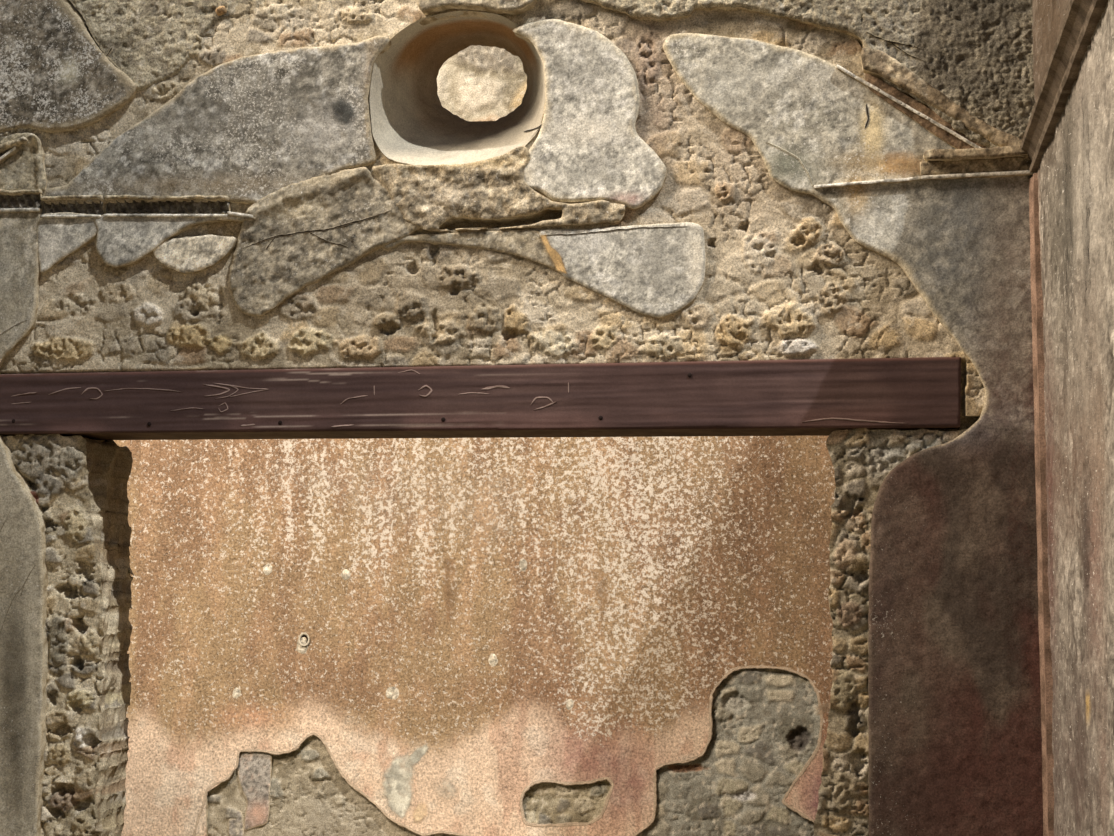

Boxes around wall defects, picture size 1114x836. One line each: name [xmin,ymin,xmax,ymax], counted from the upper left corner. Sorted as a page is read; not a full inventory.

crack [244,210,392,249]
spalling [0,0,985,419]
spalling [1,434,134,836]
flaking render [296,633,309,654]
flaking render [386,687,399,699]
spalling [633,418,968,836]
spalling [193,732,471,836]
spalling [520,777,614,827]